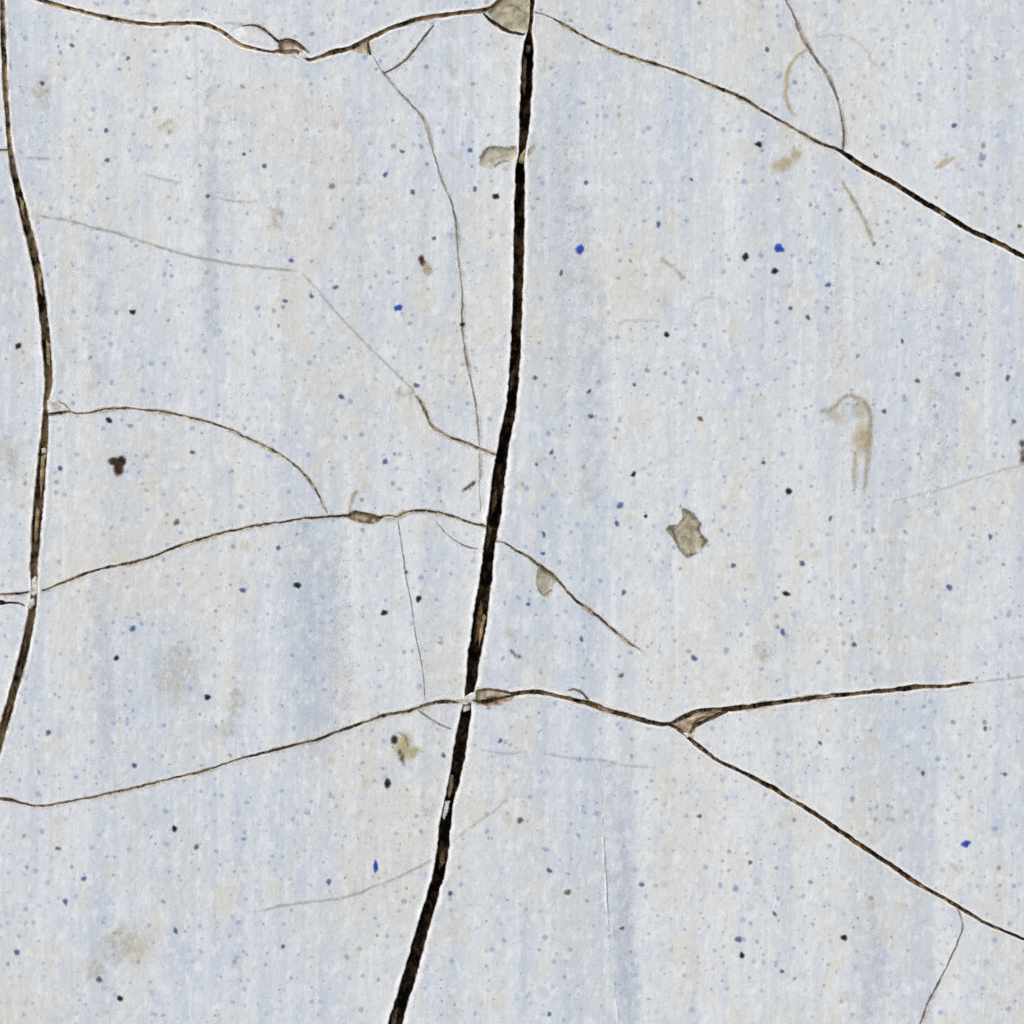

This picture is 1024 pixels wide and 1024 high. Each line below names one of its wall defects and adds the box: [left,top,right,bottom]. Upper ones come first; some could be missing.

crack [29,0,502,64]
spalling [483,0,530,36]
spalling [479,143,536,168]
crack [0,0,350,764]
spalling [666,508,709,556]
crack [373,0,1024,1024]
crack [0,699,458,807]